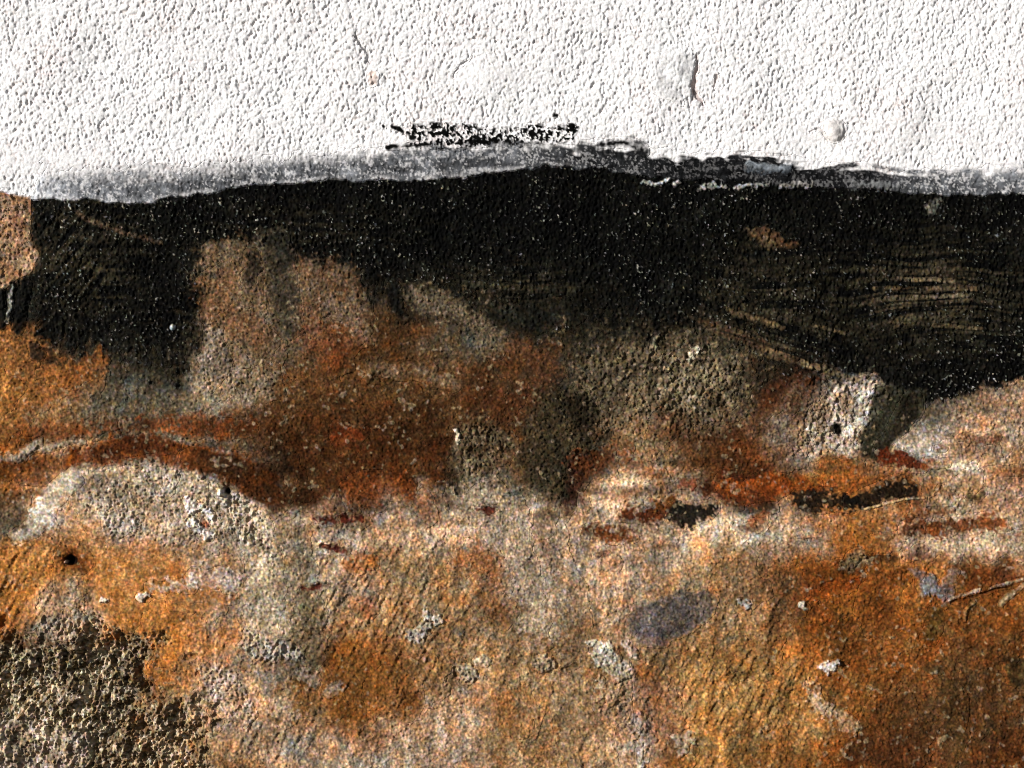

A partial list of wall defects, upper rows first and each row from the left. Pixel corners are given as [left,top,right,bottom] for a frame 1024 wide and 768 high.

water stain [240,223,305,341]
rust [0,322,567,534]
rust [566,369,1024,650]
rust [0,505,253,677]
rust [444,535,520,632]
rust [282,638,546,740]
rust [630,657,699,768]